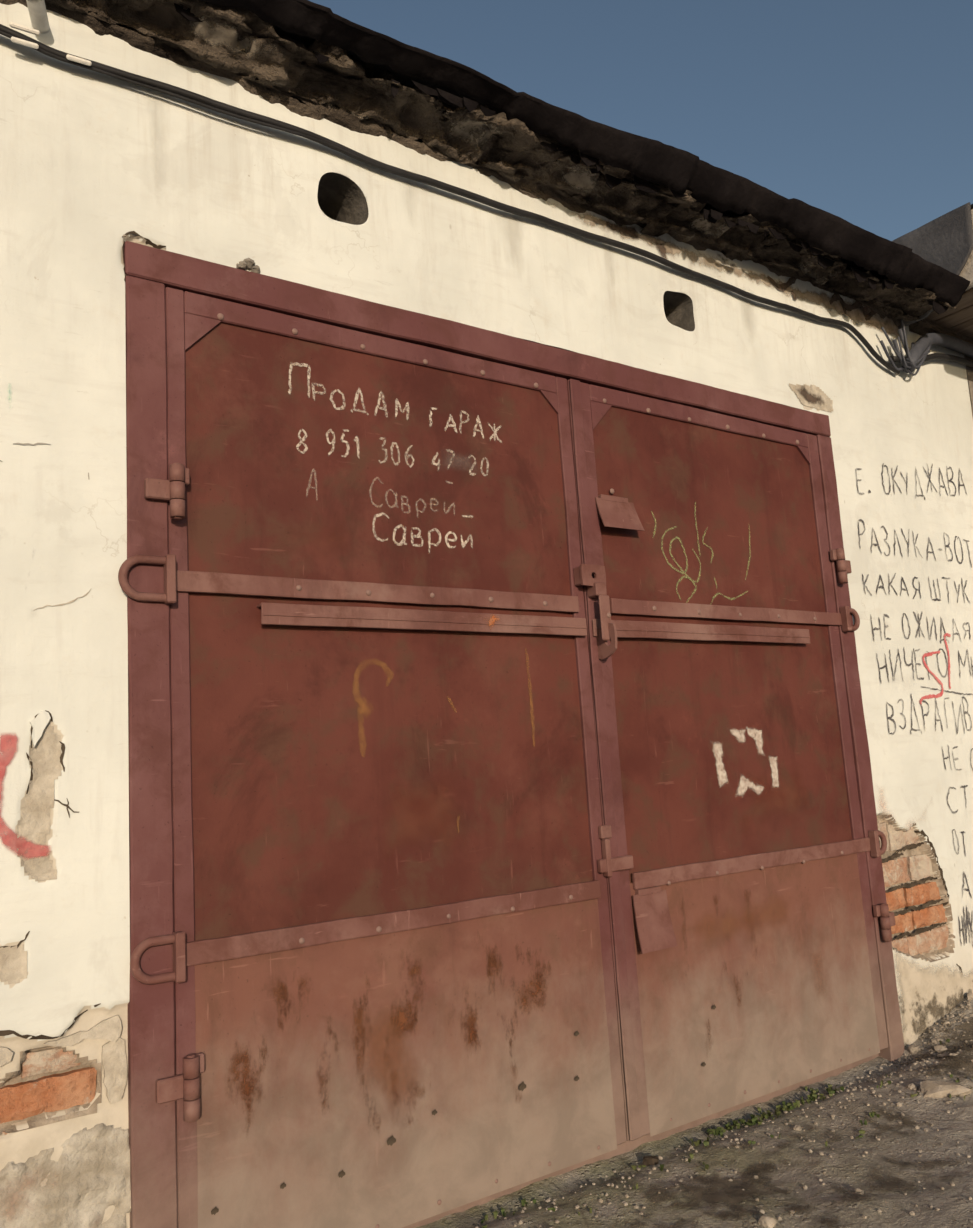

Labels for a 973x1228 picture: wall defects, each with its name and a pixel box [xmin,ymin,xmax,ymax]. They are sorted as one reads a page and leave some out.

spalling [191,17,258,57]
flaking render [789,383,833,413]
flaking render [17,710,65,881]
flaking render [876,813,955,962]
flaking render [0,931,30,985]
corrosion [464,1016,477,1043]
corrosion [228,1052,257,1108]
flaking render [0,1015,131,1228]